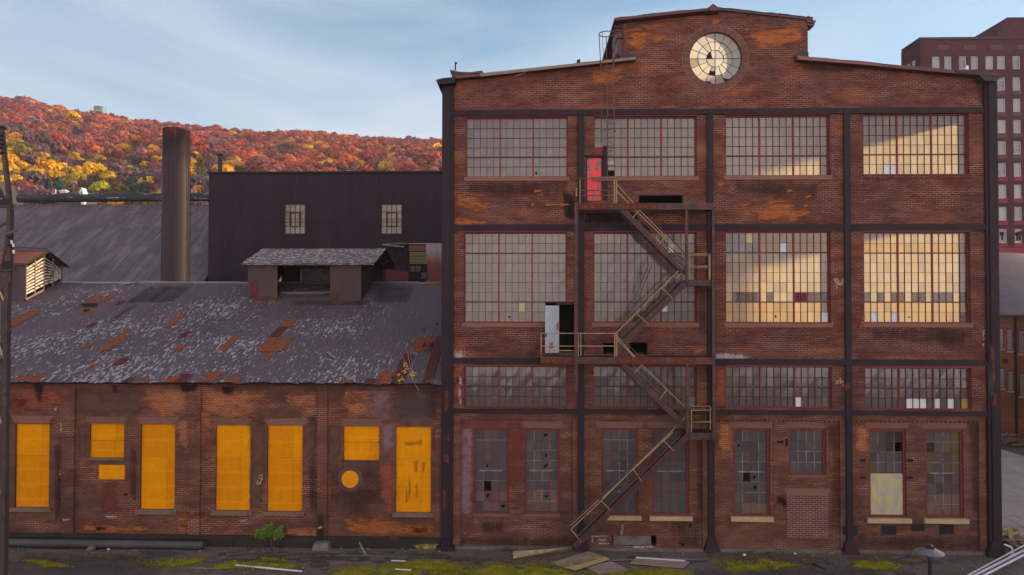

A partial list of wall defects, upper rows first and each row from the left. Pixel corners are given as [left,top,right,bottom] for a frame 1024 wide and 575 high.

spalling [624,23,667,50]
spalling [744,24,803,49]
spalling [589,64,627,85]
spalling [454,191,490,225]
spalling [742,189,816,222]
rust [81,330,130,369]
rust [165,313,191,351]
rust [258,318,298,360]
rust [339,337,432,384]
spalling [343,461,435,549]